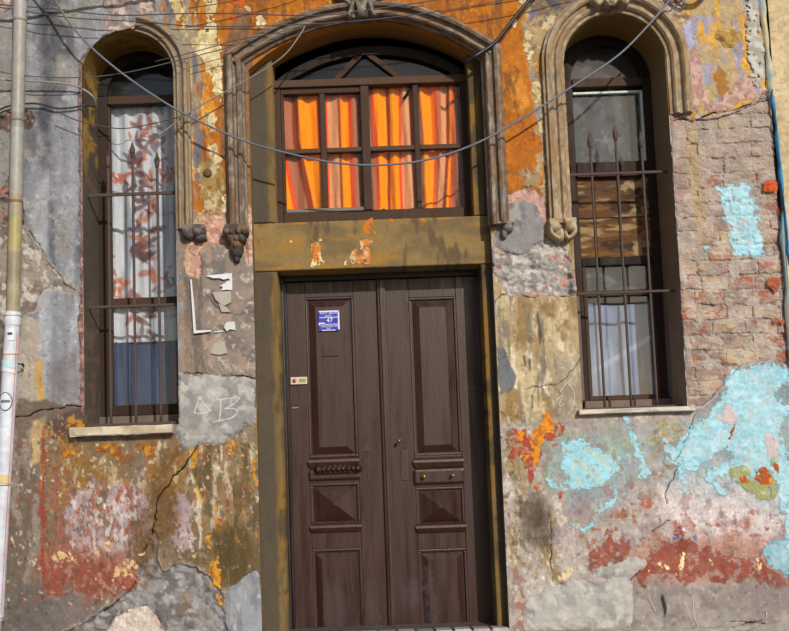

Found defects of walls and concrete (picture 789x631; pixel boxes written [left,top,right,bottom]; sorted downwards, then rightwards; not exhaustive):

flaking render [100,0,155,38]
peeling [191,0,224,102]
crack [682,59,768,121]
flaking render [20,45,93,416]
flaking render [187,143,230,276]
flaking render [492,161,577,297]
flaking render [634,0,789,588]
crack [15,405,81,418]
peeling [506,411,652,499]
flaking render [38,426,228,631]
crack [72,445,198,630]
peeling [589,526,631,572]